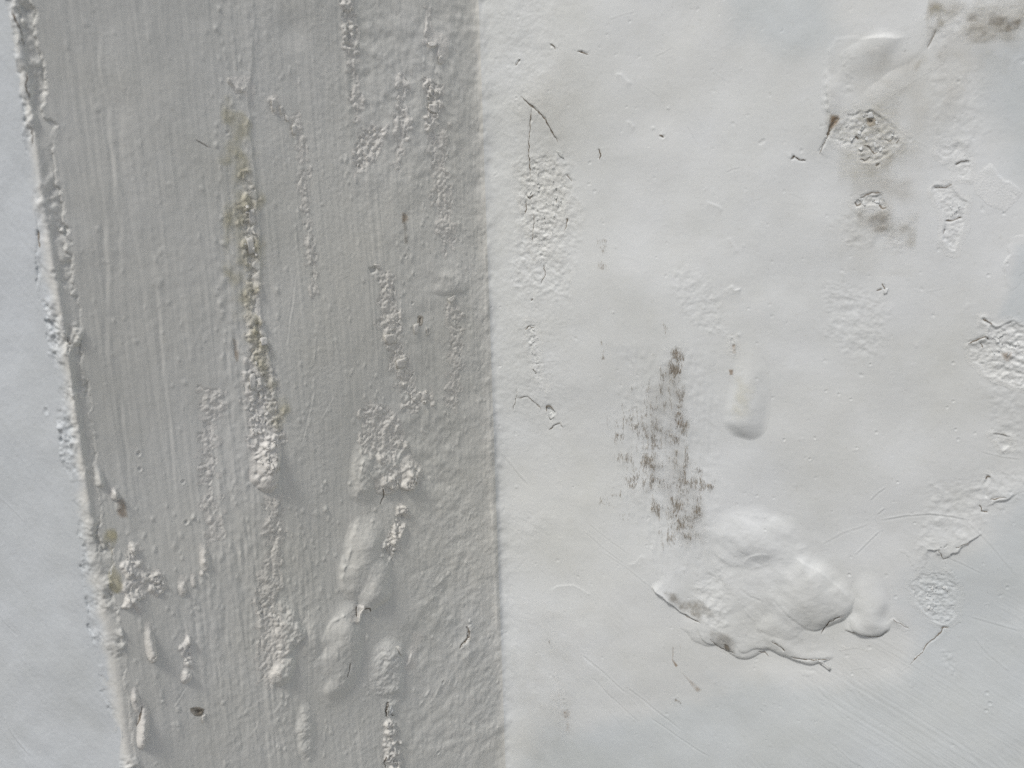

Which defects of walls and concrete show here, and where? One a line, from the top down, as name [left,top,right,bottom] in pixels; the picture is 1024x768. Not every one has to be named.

peeling [828,104,908,170]
peeling [963,312,1024,393]
mould [630,350,714,541]